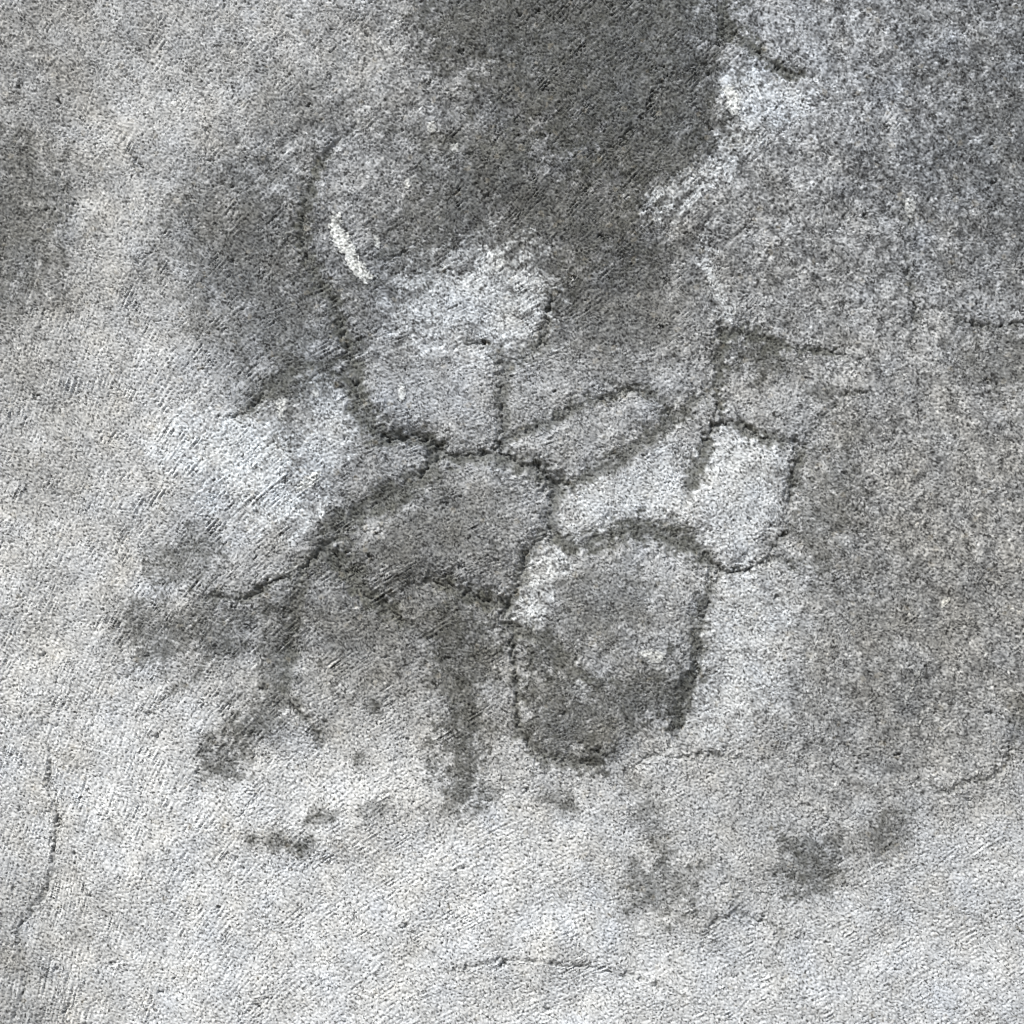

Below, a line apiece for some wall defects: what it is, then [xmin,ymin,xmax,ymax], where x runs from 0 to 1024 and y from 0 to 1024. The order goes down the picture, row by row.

leakage [94,0,824,802]
crack [194,110,878,782]
leakage [293,408,1024,940]